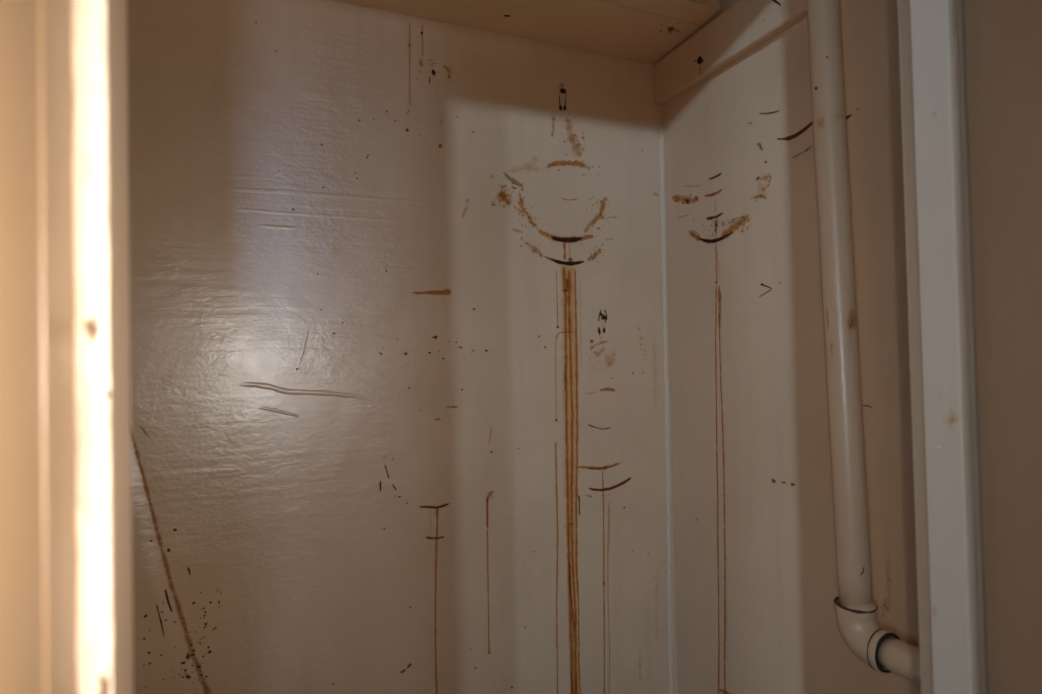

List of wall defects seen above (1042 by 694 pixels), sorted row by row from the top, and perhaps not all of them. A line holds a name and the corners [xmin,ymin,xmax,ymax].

rust [699,218,733,243]
rust [578,478,631,515]